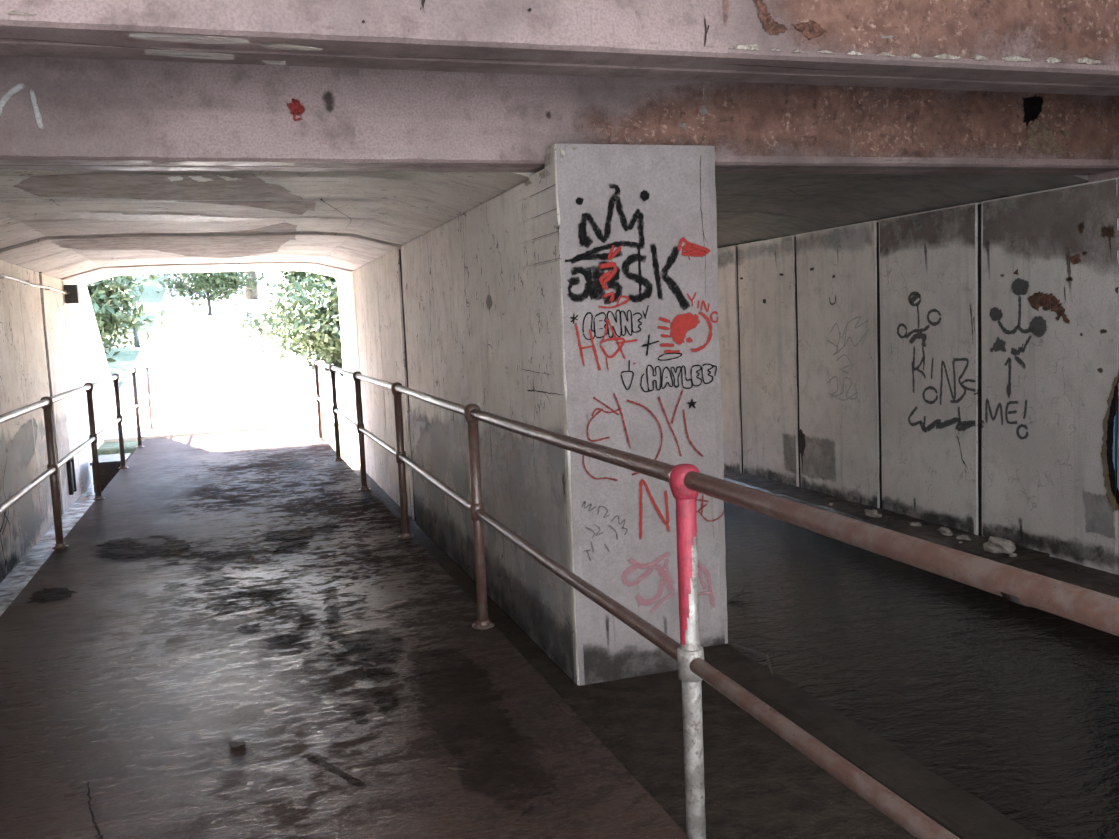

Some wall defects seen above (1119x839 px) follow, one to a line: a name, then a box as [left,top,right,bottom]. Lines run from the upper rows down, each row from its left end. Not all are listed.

spalling [728,0,896,56]
spalling [911,53,1031,62]
spalling [1075,57,1101,65]
spalling [1027,291,1070,324]
water stain [0,423,69,582]
water stain [409,411,678,685]
water stain [27,587,77,604]
crack [87,781,103,839]